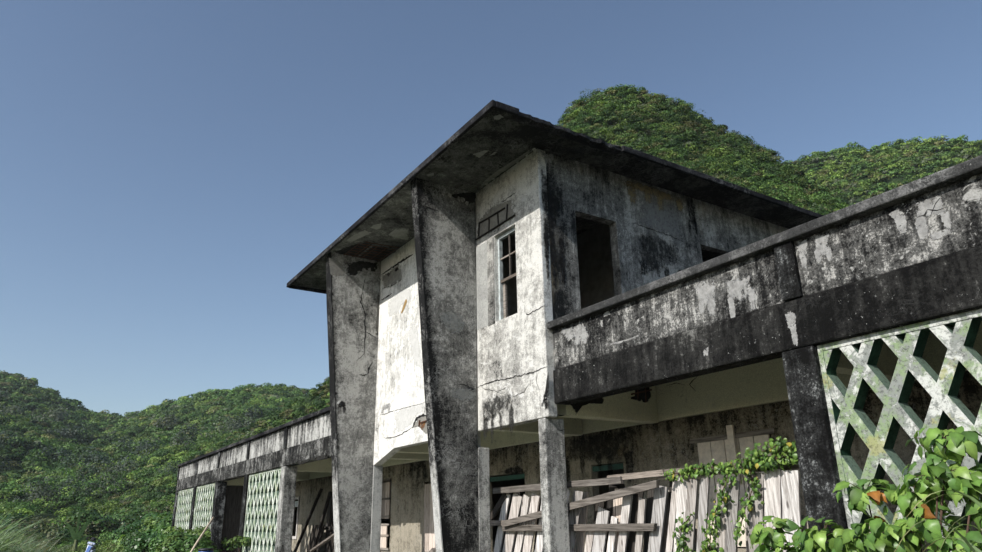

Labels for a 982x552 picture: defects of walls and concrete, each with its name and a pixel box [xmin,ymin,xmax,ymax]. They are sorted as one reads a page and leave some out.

water stain [541,151,566,287]
water stain [623,181,698,235]
peeling [889,196,951,241]
water stain [639,235,681,277]
crack [350,254,413,376]
efflorescence [785,311,798,346]
crack [460,367,545,397]
peeling [394,404,427,434]
water stain [409,461,427,482]